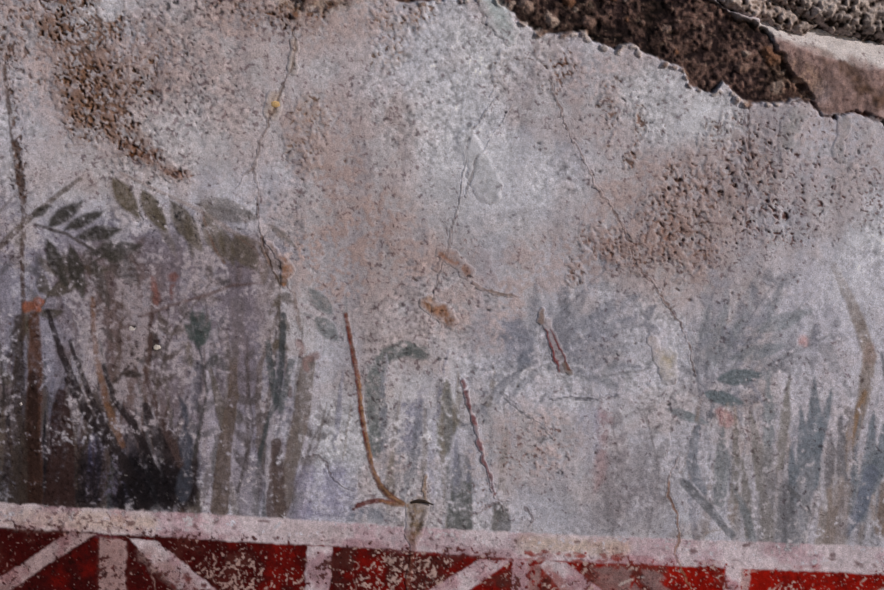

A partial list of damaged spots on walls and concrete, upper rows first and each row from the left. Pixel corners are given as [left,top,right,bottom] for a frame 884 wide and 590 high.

flaking render [7,130,36,212]
flaking render [0,0,444,187]
crack [235,26,297,288]
crack [429,83,513,322]
flaking render [481,0,884,289]
flaking render [460,406,585,528]